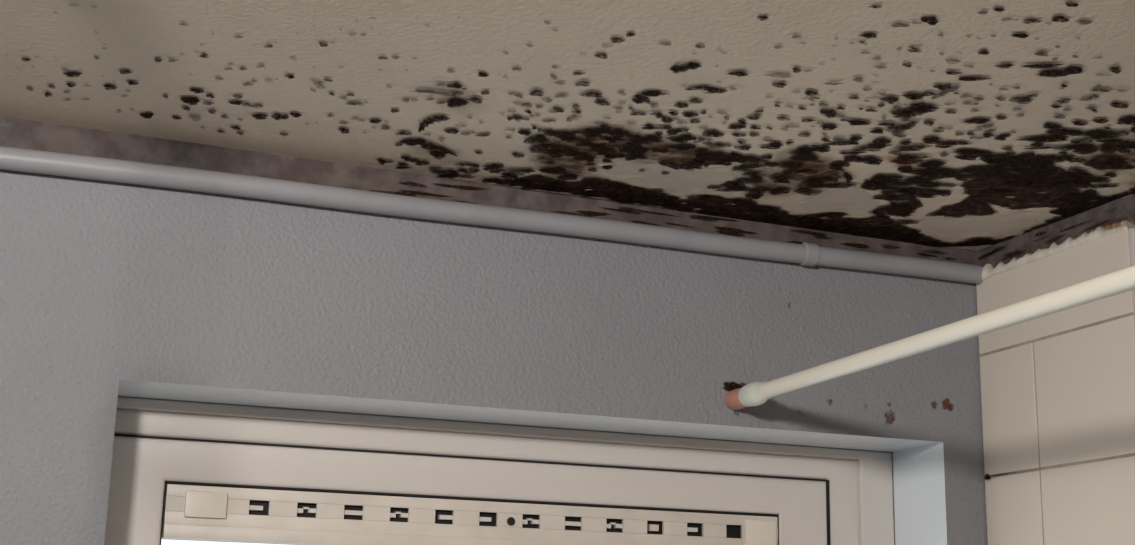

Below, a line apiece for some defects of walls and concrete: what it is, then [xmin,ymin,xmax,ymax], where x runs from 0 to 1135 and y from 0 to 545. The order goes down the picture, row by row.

leakage [891,17,943,36]
leakage [978,2,1092,38]
leakage [594,33,635,59]
leakage [858,33,886,69]
leakage [0,46,1135,268]